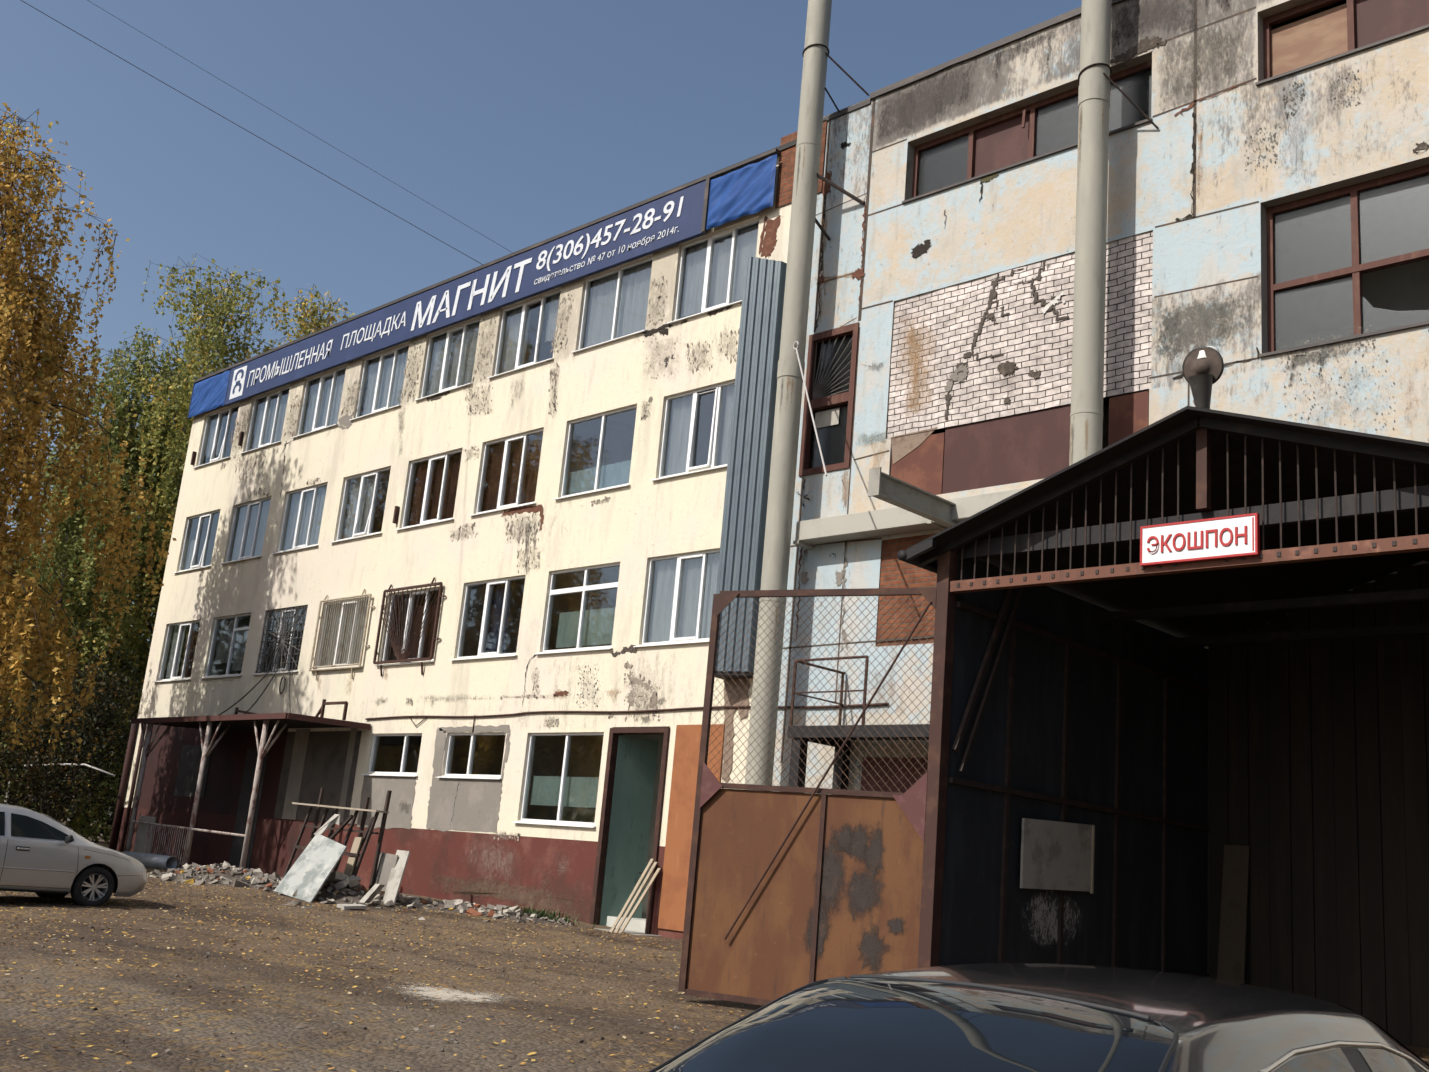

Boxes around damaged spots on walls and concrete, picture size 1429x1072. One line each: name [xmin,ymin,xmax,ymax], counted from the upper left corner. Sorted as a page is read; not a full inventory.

leakage [1114,0,1235,91]
leakage [880,59,977,136]
flaking render [759,131,798,258]
flaking render [817,120,832,195]
spalling [911,239,932,258]
spalling [642,276,740,378]
crack [945,260,1069,420]
leakage [1156,294,1251,355]
spalling [501,505,544,573]
peeling [500,645,661,722]